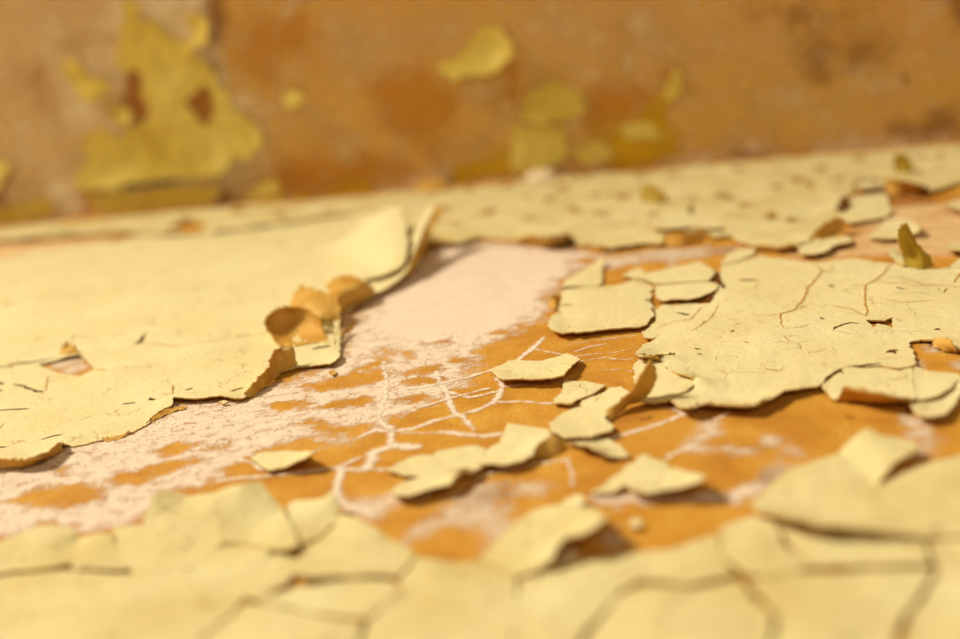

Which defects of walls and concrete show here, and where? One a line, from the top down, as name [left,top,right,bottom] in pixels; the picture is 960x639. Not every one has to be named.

peeling [0,0,960,498]
crack [214,269,757,516]
crack [754,263,960,329]
crack [839,349,897,373]
peeling [0,428,960,639]